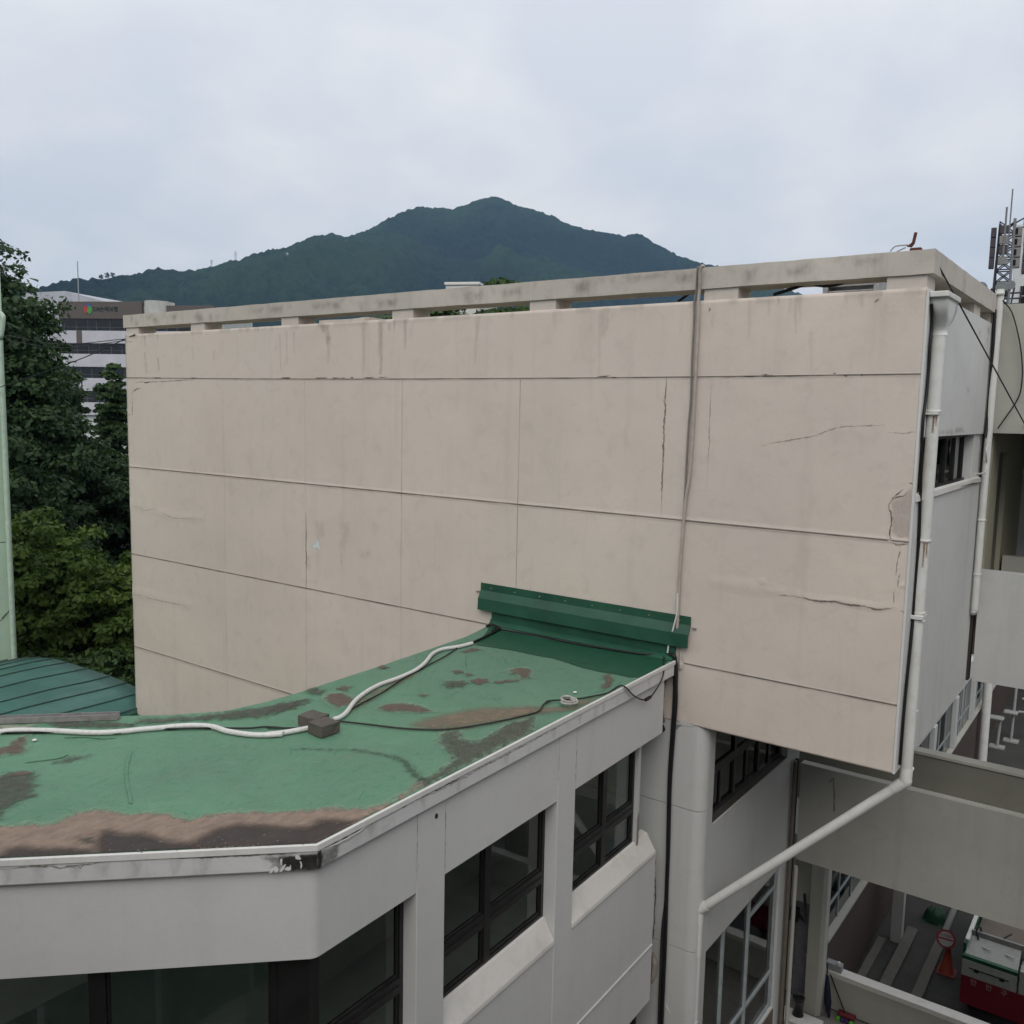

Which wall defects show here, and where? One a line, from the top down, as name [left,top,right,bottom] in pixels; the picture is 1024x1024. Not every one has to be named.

crack [660,385,668,490]
crack [784,595,903,612]
peeling [0,716,537,873]